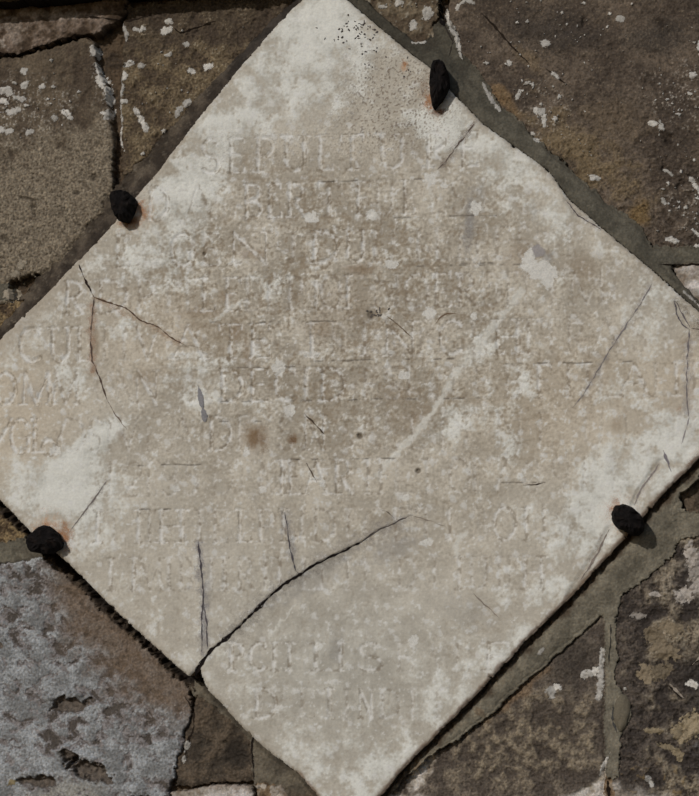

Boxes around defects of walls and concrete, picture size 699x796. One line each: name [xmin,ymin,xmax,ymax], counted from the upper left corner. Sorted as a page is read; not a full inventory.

crack [0,15,151,57]
crack [173,21,214,33]
crack [436,0,454,54]
corrosion [114,199,156,235]
crack [661,261,699,269]
crack [79,265,184,428]
crack [573,283,653,407]
crack [674,300,699,442]
corrosion [26,506,77,553]
crack [191,501,446,678]
crack [184,697,195,760]